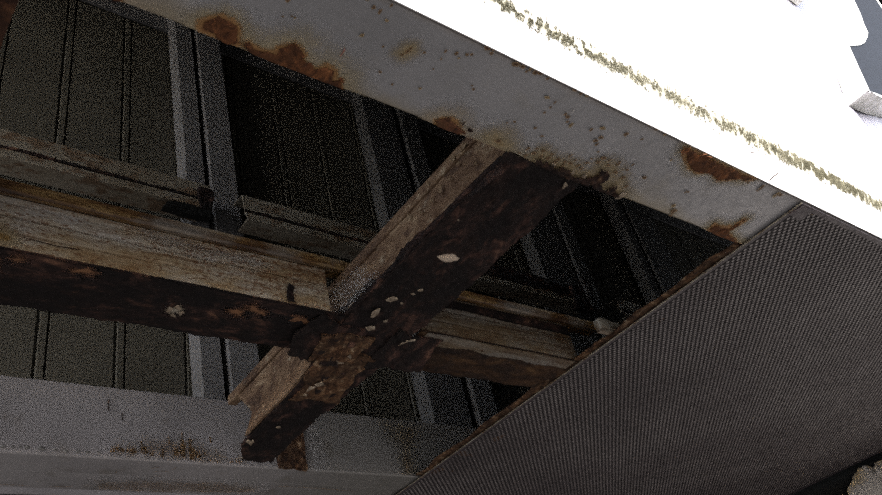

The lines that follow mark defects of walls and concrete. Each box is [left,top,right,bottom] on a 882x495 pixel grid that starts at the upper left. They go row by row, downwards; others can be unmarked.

rust [189,9,351,90]
rust [425,110,473,137]
damp [530,147,626,198]
rust [670,145,765,192]
rust [704,216,751,244]
rust [110,433,218,481]